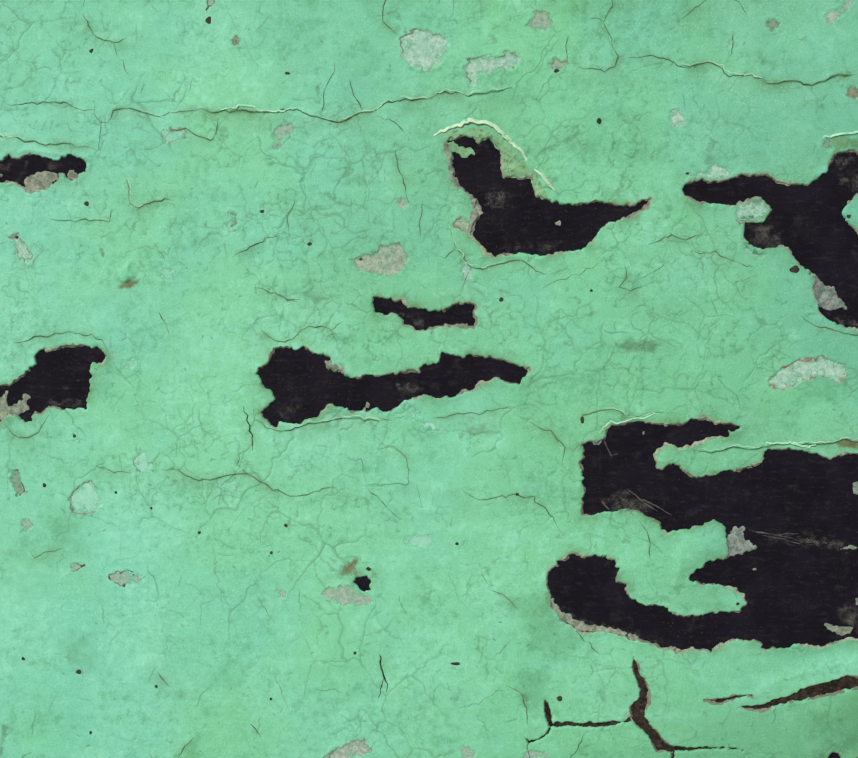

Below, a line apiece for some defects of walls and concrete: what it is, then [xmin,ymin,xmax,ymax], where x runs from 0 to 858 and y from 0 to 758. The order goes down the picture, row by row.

spalling [399,28,447,72]
peeling [0,153,86,194]
peeling [434,118,652,259]
spalling [350,242,407,276]
peeling [682,131,858,331]
peeling [372,295,478,332]
peeling [0,343,106,424]
peeling [256,346,531,429]
spalling [769,355,858,391]
peeling [546,413,858,654]
crack [460,660,736,758]
crack [703,675,858,713]